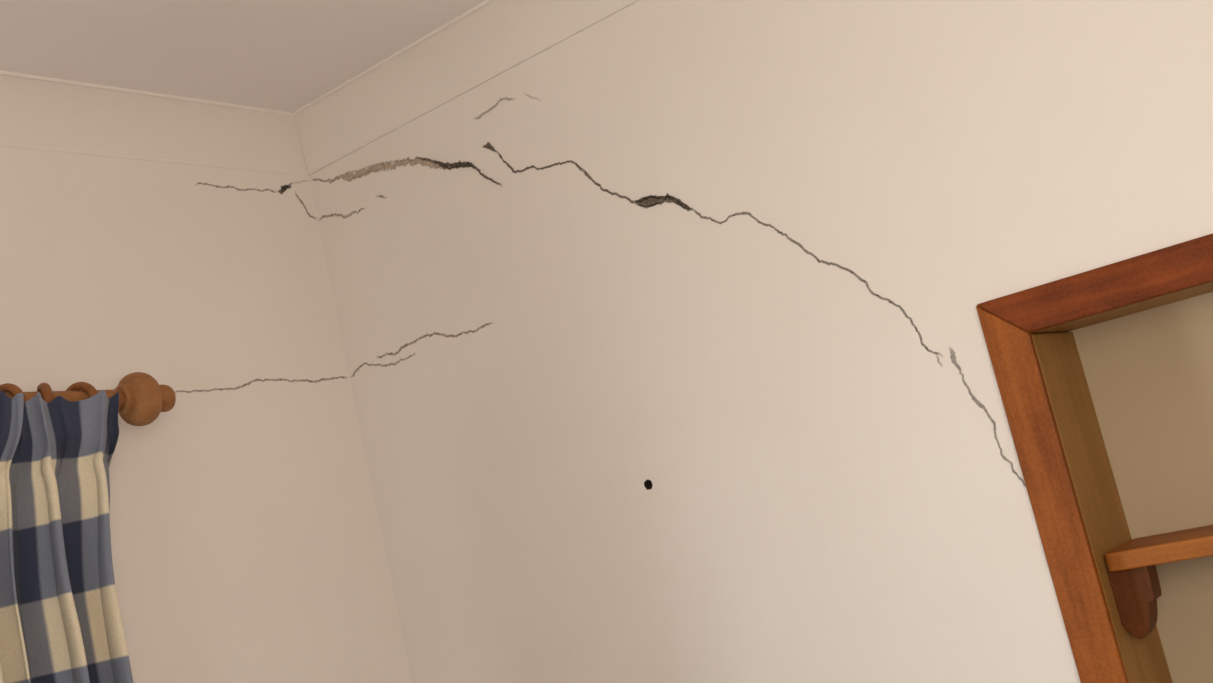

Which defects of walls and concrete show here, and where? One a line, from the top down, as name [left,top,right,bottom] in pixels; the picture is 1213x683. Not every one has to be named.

crack [176,142,1025,486]